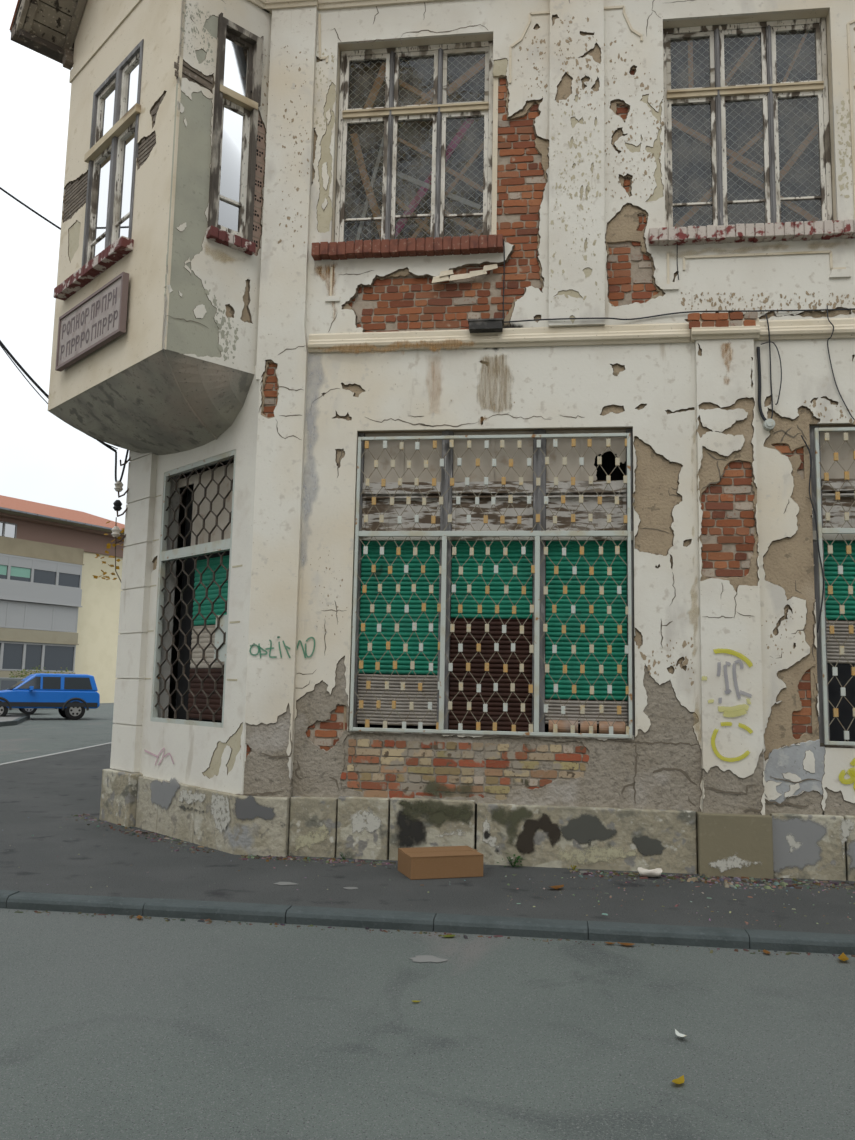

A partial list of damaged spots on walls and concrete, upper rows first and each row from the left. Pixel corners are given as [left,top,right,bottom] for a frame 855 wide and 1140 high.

peeling [180,0,218,65]
peeling [151,84,250,364]
spalling [343,16,665,332]
peeling [836,73,855,198]
flaking render [681,291,855,329]
spalling [203,358,855,817]
water stain [351,810,381,833]
water stain [396,800,664,864]